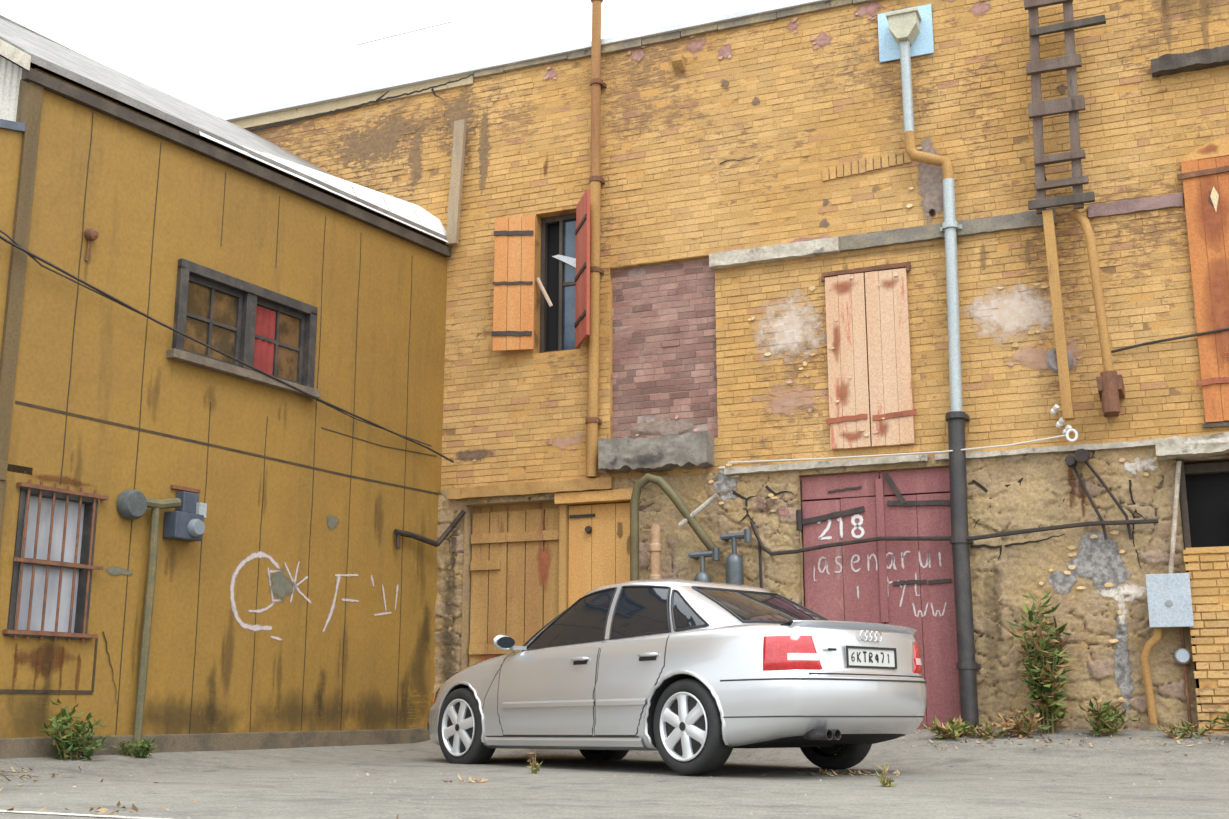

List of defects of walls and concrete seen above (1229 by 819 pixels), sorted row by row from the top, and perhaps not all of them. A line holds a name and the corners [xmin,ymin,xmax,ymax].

peeling [969,283,1052,347]
peeling [748,299,829,415]
leakage [1098,583,1146,630]
corrosion [12,645,81,699]